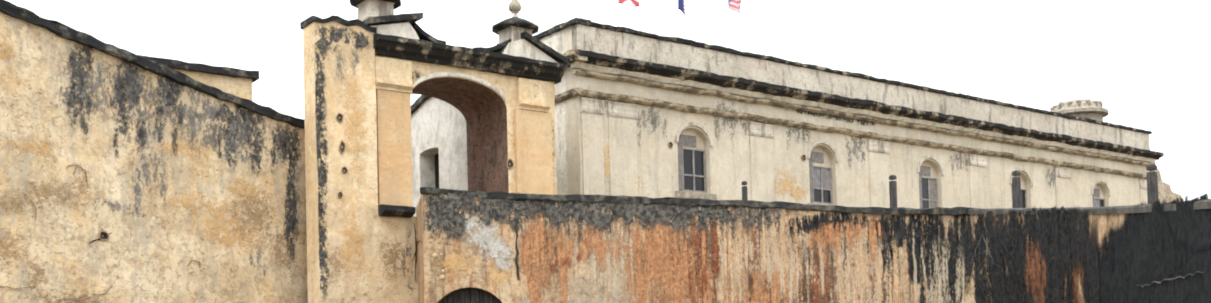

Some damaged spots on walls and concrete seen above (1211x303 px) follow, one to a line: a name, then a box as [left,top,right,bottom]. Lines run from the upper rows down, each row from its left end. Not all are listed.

water stain [63,45,300,272]
water stain [315,26,369,297]
corrosion [520,211,926,303]
water stain [425,191,1211,303]